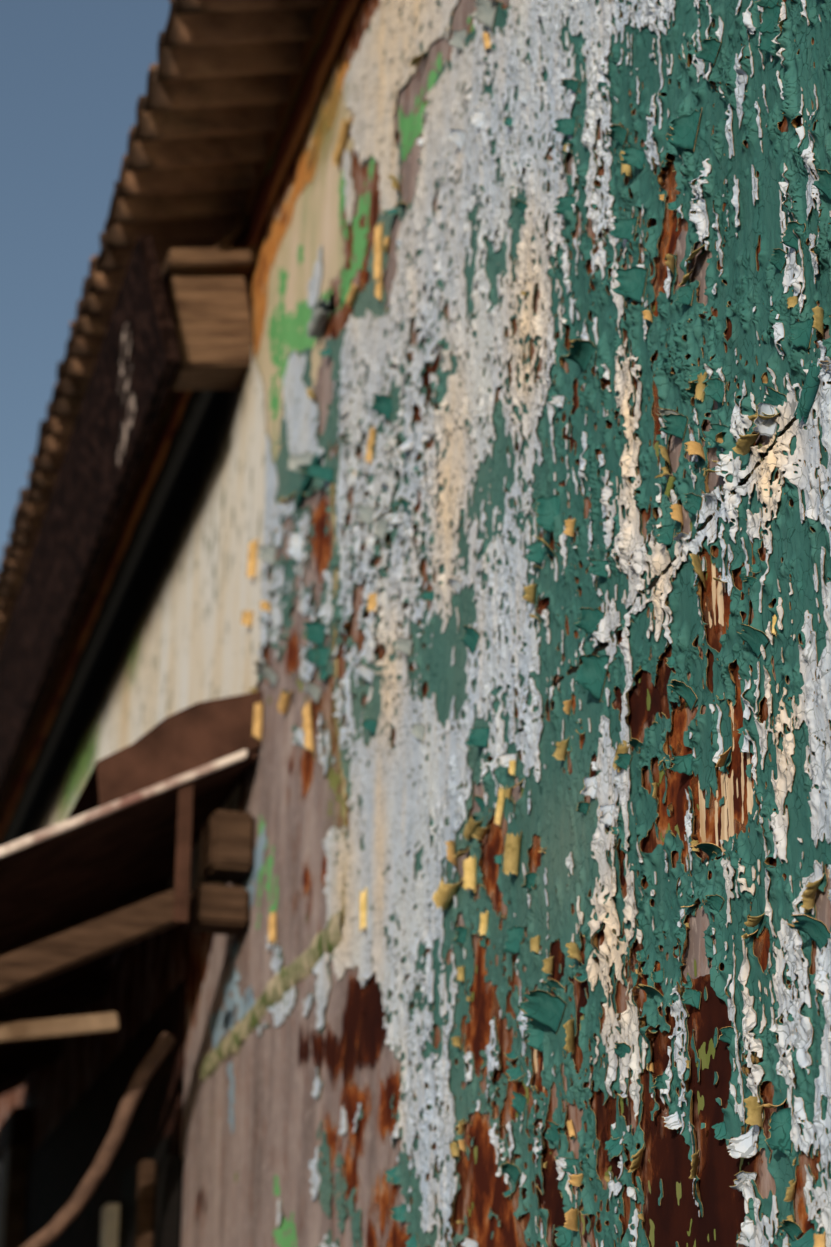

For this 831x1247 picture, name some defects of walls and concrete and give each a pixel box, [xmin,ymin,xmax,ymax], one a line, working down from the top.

peeling [373,0,510,312]
corrosion [607,108,702,323]
peeling [654,296,831,547]
crack [518,400,815,732]
corrosion [689,547,777,658]
peeling [180,298,419,1247]
corrosion [298,974,412,1247]
peeling [432,781,486,947]
peeling [464,727,524,808]
corrosion [449,787,826,1247]
corrosion [552,653,760,887]
peeling [786,868,831,952]